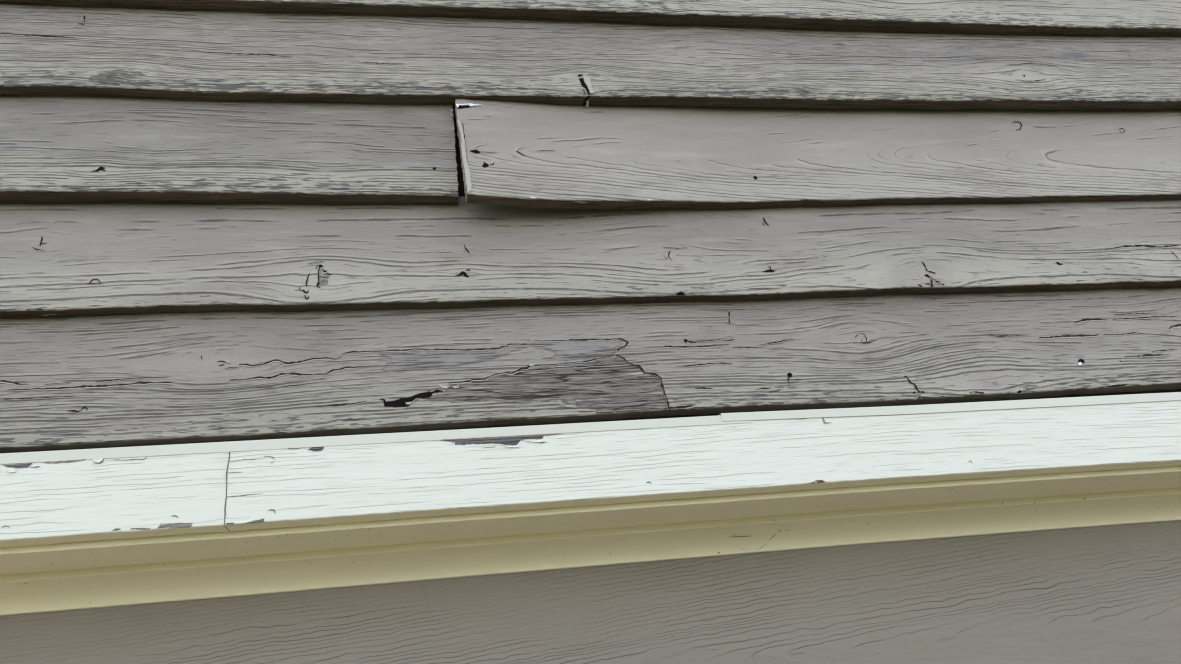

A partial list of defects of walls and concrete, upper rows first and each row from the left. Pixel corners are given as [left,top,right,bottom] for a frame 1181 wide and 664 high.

peeling [359,338,693,414]
peeling [441,433,561,448]
crack [224,452,263,525]